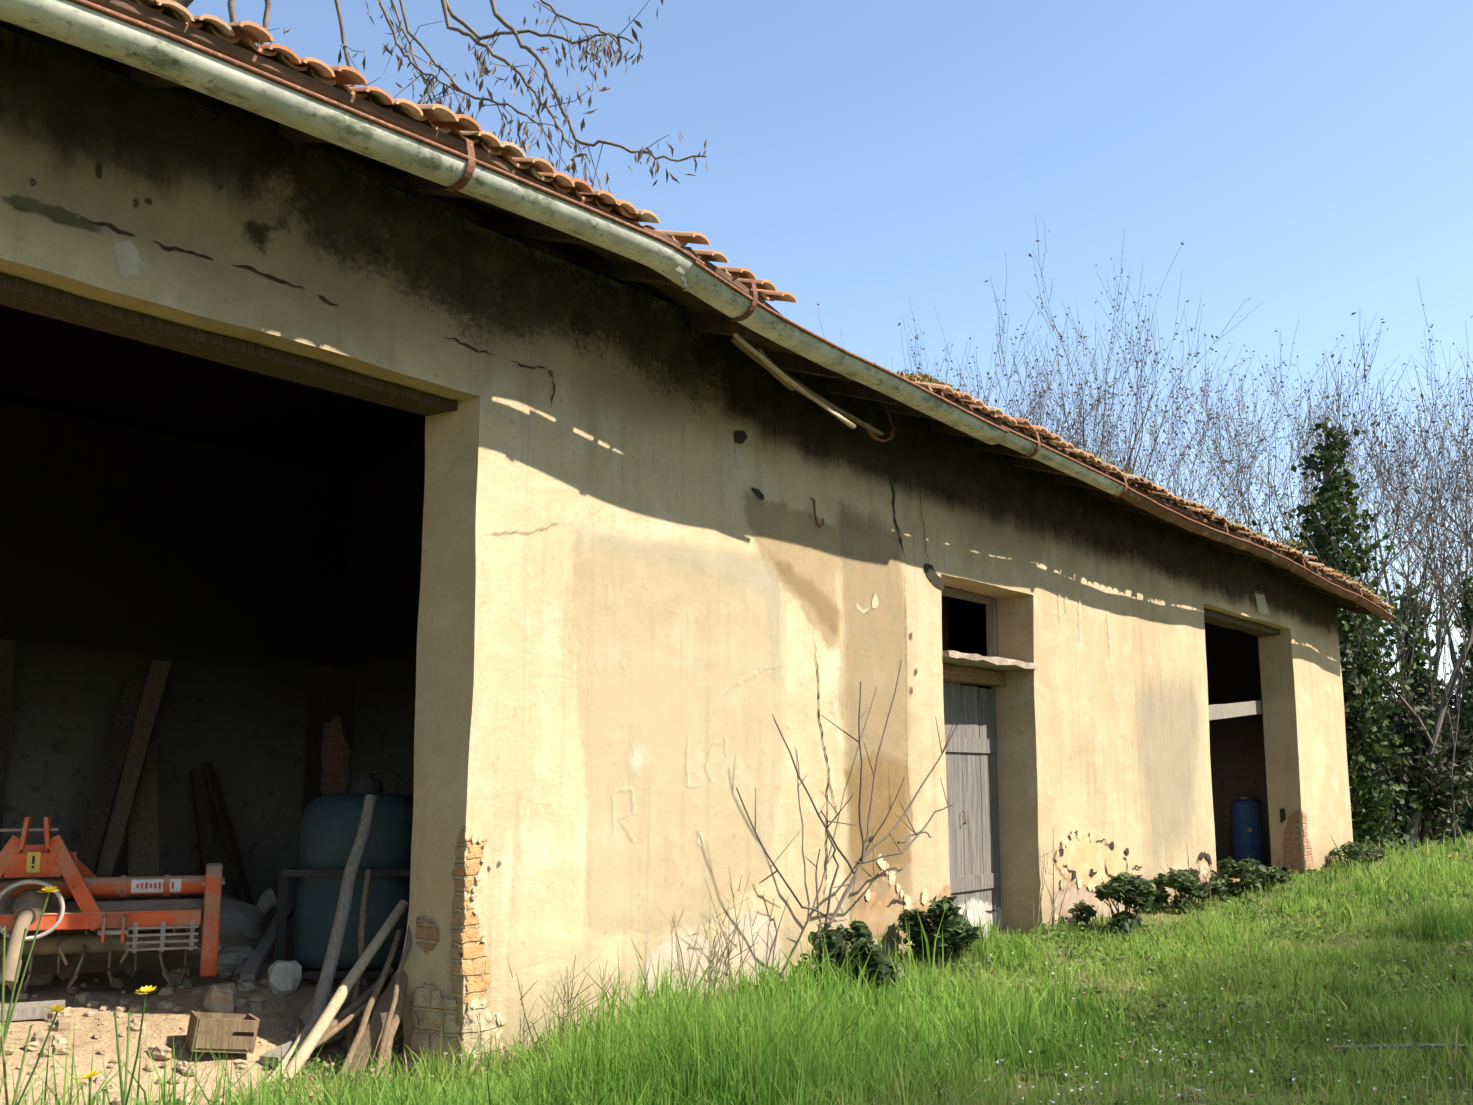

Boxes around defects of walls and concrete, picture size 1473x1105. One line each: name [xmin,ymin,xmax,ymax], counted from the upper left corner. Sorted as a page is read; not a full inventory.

leakage [0,21,1339,632]
crack [890,477,929,565]
spalling [319,716,351,796]
spalling [410,825,507,1080]
leakage [841,509,909,903]
peeling [1052,828,1152,928]